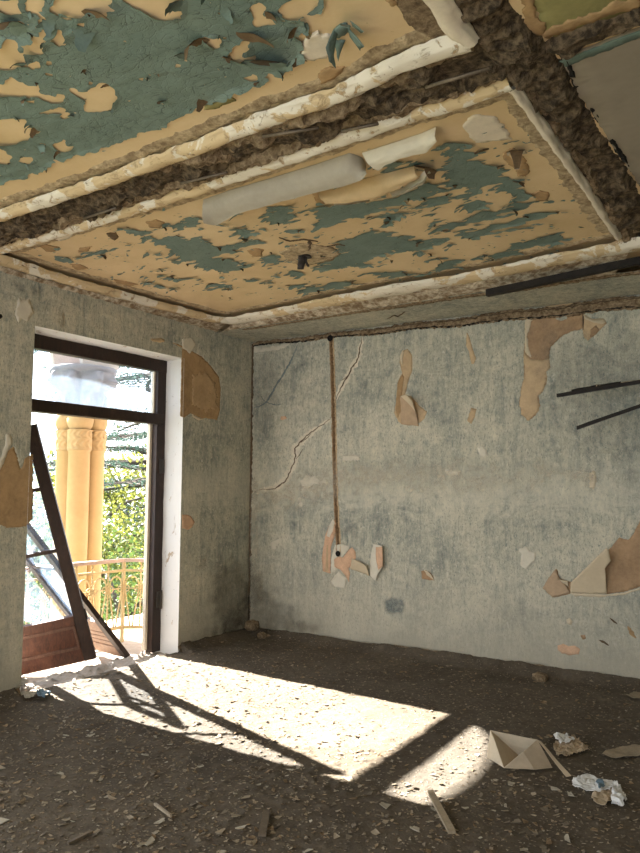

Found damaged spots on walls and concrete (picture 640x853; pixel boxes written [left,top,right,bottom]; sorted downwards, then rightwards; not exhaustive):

spalling [0,0,640,301]
peeling [0,433,34,528]
peeling [174,337,221,420]
crack [248,344,331,620]
crack [335,337,364,400]
spalling [243,292,640,598]